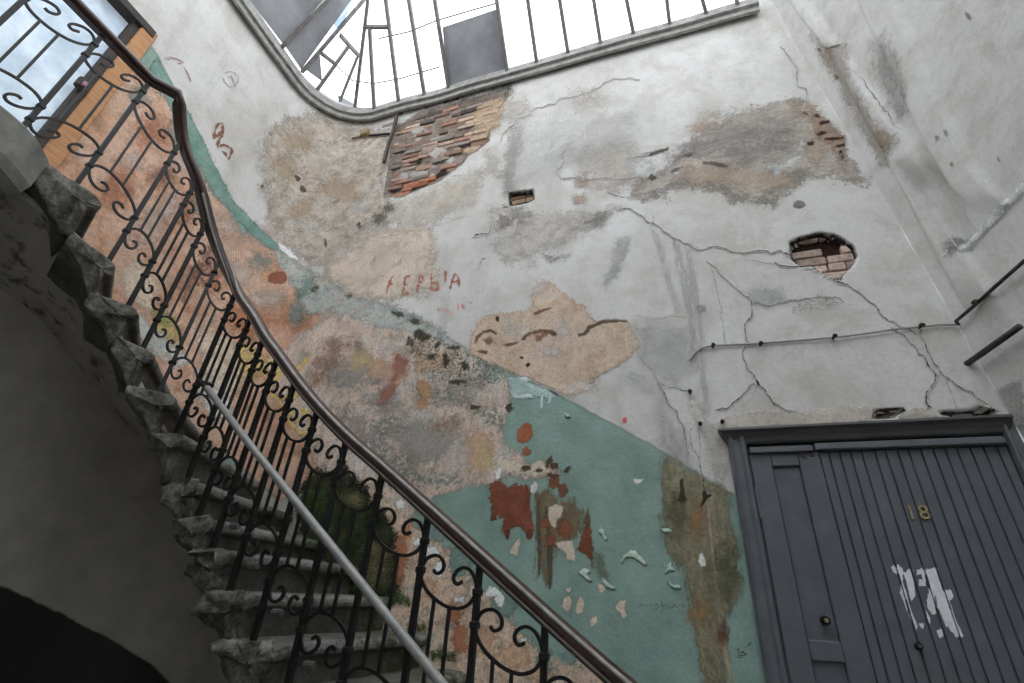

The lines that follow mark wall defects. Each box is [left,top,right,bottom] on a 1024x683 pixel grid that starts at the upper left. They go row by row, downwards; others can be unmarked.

peeling [57,67,640,683]
flaking render [490,97,870,263]
damp [659,352,744,683]
crack [499,77,996,495]
spalling [790,232,857,281]